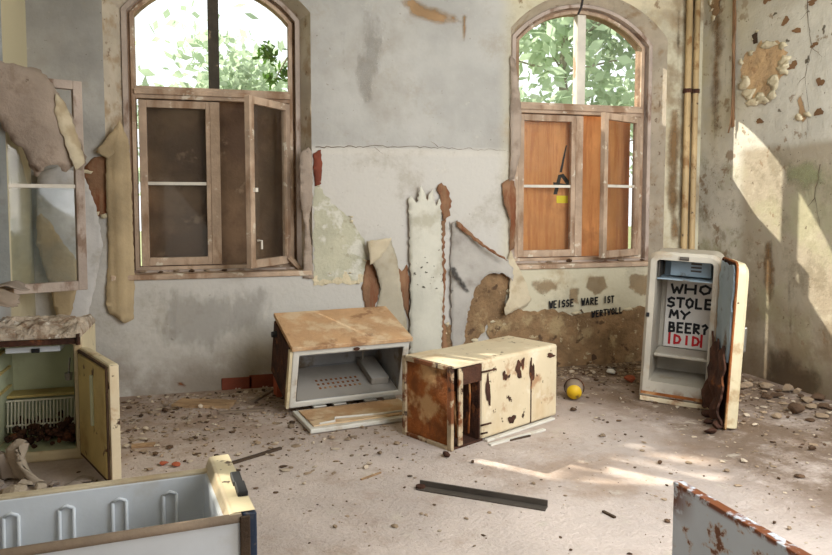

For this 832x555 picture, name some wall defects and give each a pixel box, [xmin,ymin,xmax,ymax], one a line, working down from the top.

spalling [737,12,818,107]
crack [799,0,820,136]
spalling [299,55,645,367]